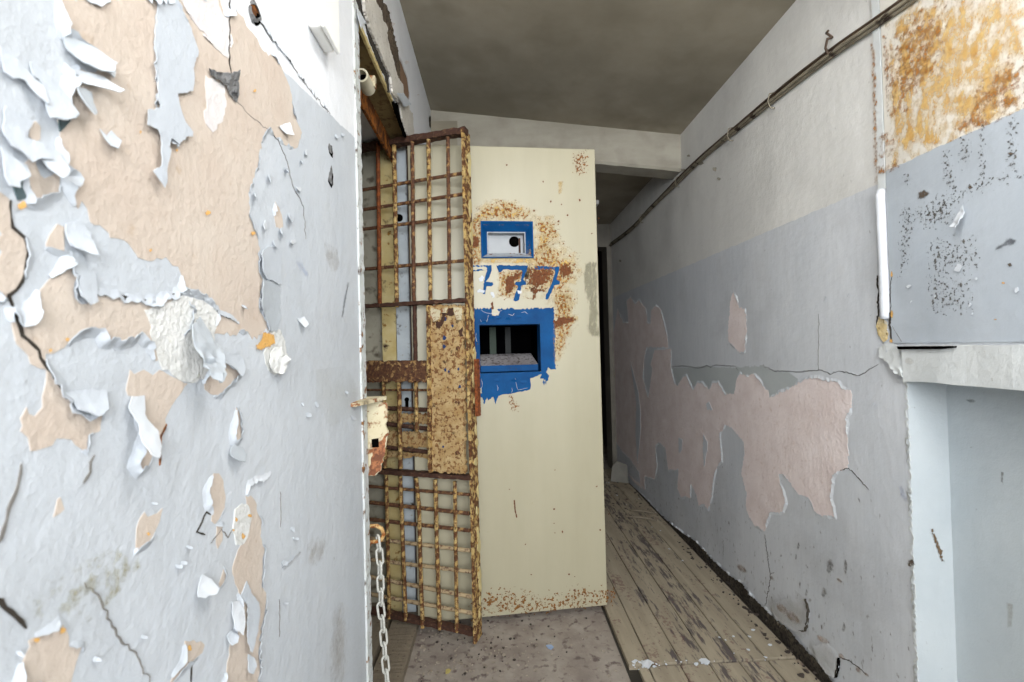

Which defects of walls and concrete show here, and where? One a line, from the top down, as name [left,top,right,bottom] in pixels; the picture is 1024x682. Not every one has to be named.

crack [7,200,66,399]
peeling [0,0,331,480]
crack [226,0,234,73]
crack [237,101,306,235]
corrosion [473,199,579,366]
corrosion [871,0,1023,173]
corrosion [369,433,389,476]
peeling [613,293,852,682]
peeling [12,616,102,682]
crack [84,582,150,682]
peeling [202,471,271,682]
corrosion [468,574,617,617]